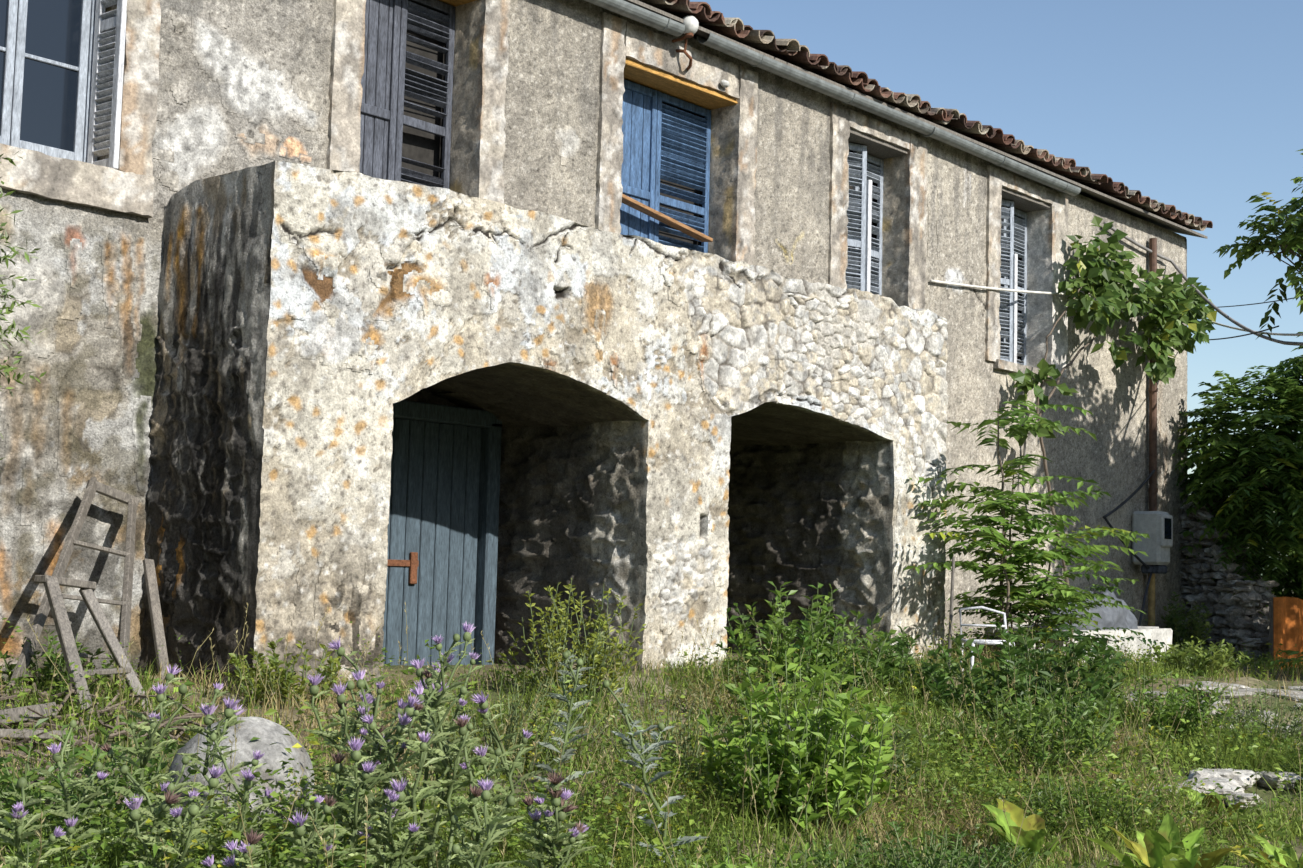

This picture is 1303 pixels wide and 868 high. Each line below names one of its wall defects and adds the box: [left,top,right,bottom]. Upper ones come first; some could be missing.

corrosion [61,221,148,380]
corrosion [163,200,208,381]
crack [280,220,340,248]
crack [386,206,682,272]
crack [718,256,743,291]
damp [132,265,251,684]
damp [252,551,384,695]